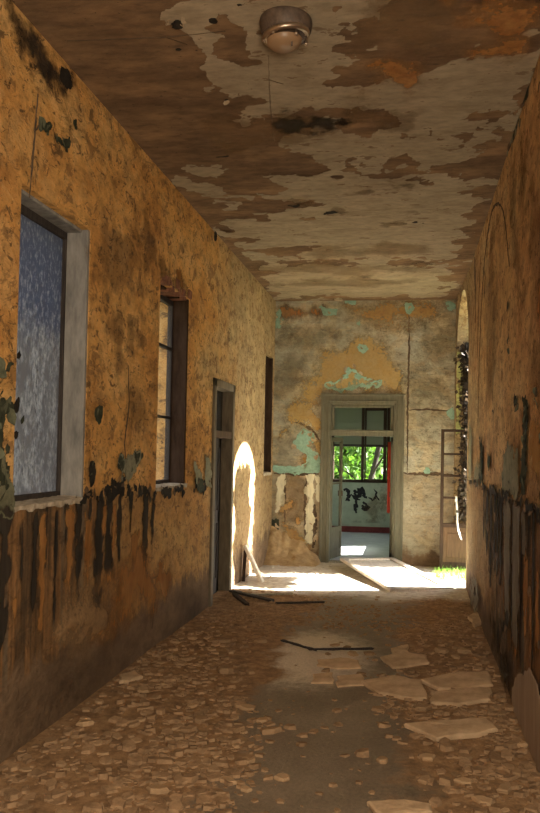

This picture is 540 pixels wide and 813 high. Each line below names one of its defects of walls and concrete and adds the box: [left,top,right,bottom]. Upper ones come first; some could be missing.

peeling [160,0,540,329]
peeling [0,350,21,378]
peeling [0,390,24,520]
leakage [0,494,133,650]
spalling [80,449,213,505]
leakage [141,494,155,564]
peeling [271,336,403,548]
crack [474,202,510,410]
peeling [468,387,540,688]